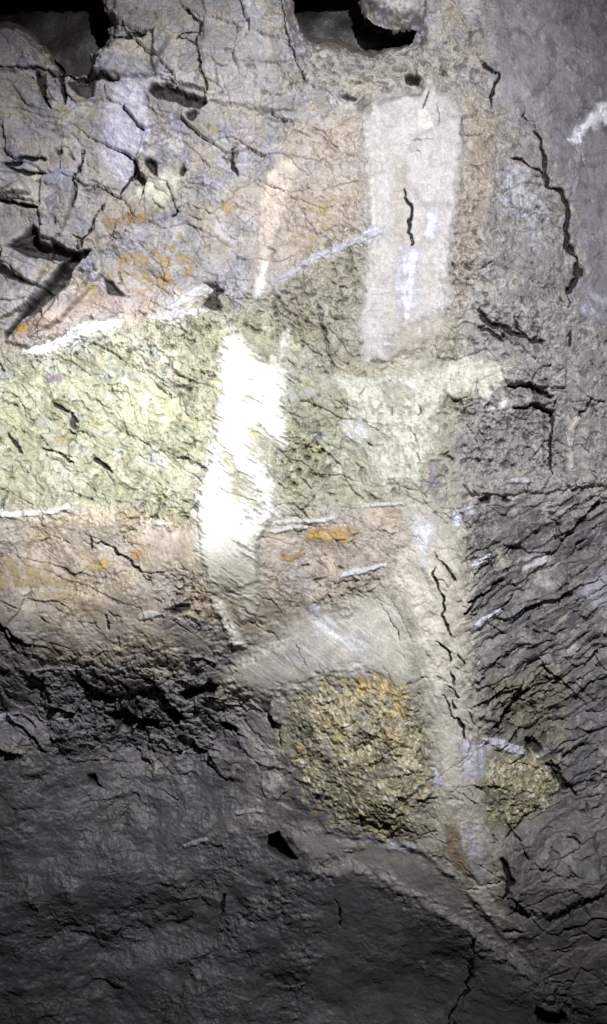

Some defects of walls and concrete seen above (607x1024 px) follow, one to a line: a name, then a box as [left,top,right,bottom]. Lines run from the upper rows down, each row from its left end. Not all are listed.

crack [113,9,208,91]
hole [293,0,417,58]
crack [0,59,118,109]
crack [5,153,46,176]
crack [72,153,137,250]
crack [403,188,414,246]
crack [511,110,583,347]
crack [478,310,543,344]
crack [507,382,591,475]
crack [90,536,165,581]
corrosion [306,528,354,544]
crack [380,553,513,738]